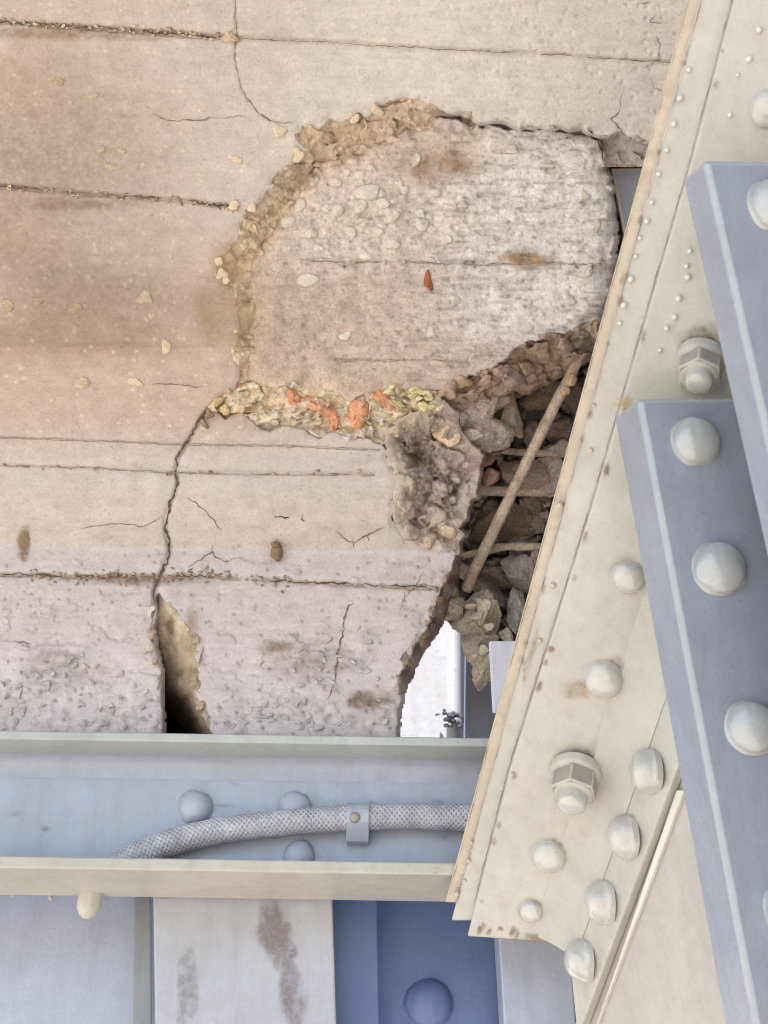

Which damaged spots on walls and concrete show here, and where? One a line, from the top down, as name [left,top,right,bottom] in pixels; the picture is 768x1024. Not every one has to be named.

crack [154,0,291,124]
spalling [155,98,648,695]
crack [85,383,237,734]
peeling [1,671,27,726]
peeling [35,653,127,729]
peeling [202,626,380,730]
crack [329,604,352,697]